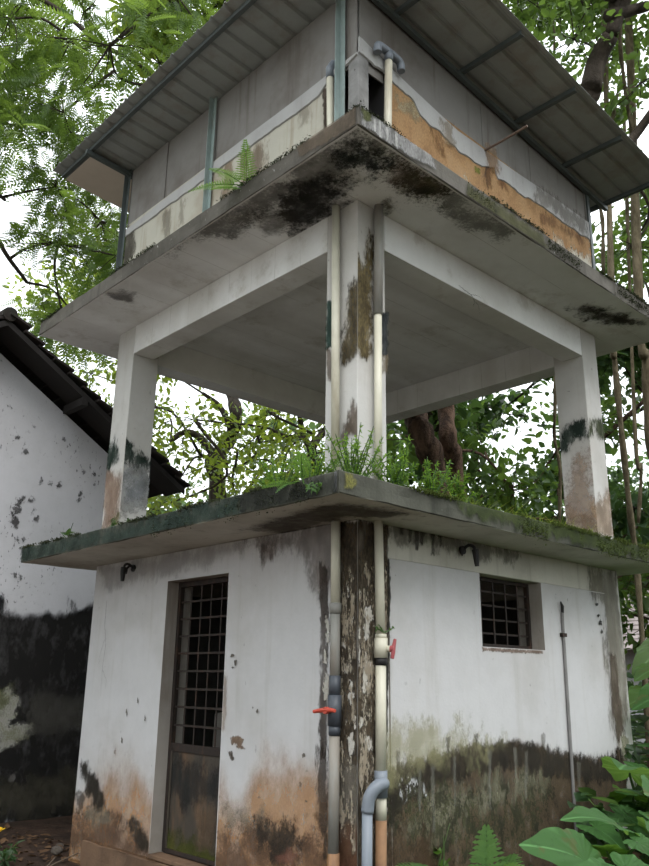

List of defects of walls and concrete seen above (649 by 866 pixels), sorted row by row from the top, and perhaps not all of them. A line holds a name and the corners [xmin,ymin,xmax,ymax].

damp [192,111,514,240]
damp [566,306,645,325]
damp [0,596,104,823]
peeling [322,618,330,701]
peeling [339,562,388,852]
damp [253,504,628,866]
damp [126,816,149,852]